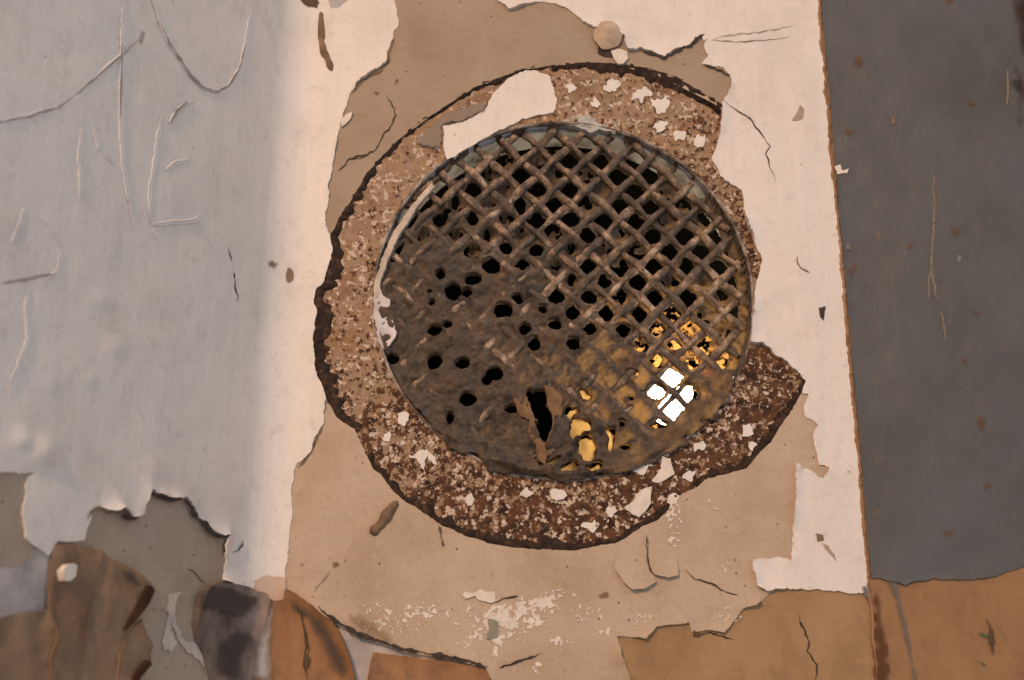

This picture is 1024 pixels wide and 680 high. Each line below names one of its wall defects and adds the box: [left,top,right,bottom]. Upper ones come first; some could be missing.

crack [338,97,396,171]
peeling [325,0,731,235]
crack [642,26,789,178]
spalling [792,105,804,121]
peeling [373,182,435,352]
rust [313,62,722,429]
rust [693,371,805,487]
peeling [0,386,874,680]
crack [688,572,737,595]
crack [798,615,818,680]